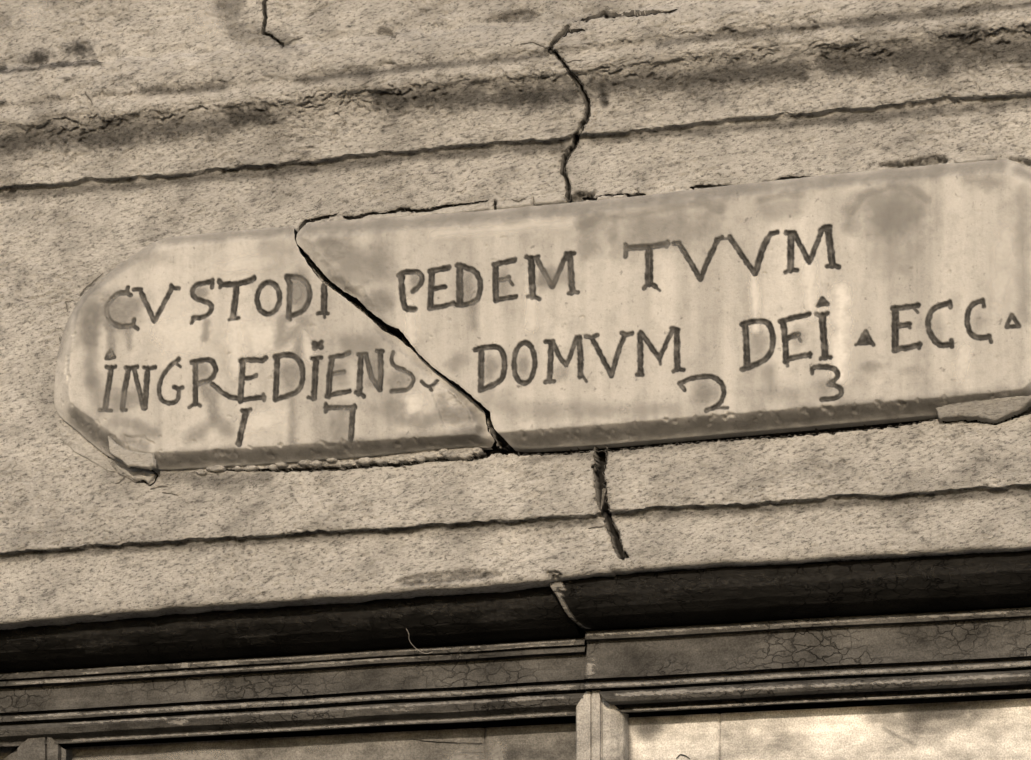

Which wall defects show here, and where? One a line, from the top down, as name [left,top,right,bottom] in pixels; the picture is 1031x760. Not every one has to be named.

crack [261,0,303,47]
crack [225,9,1031,559]